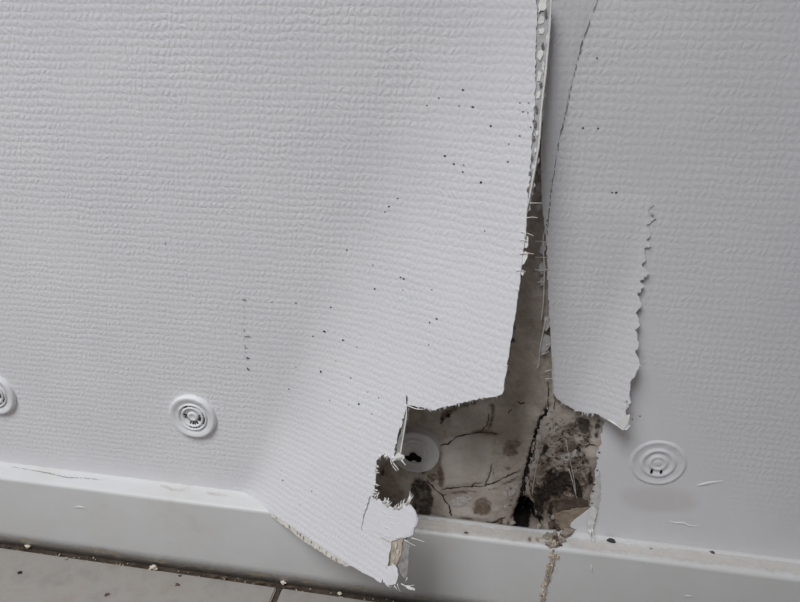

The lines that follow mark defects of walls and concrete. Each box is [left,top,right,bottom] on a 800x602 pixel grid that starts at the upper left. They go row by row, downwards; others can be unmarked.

peeling [537,0,548,81]
flaking render [372,116,604,532]
crack [426,382,556,523]
damp [504,417,600,602]